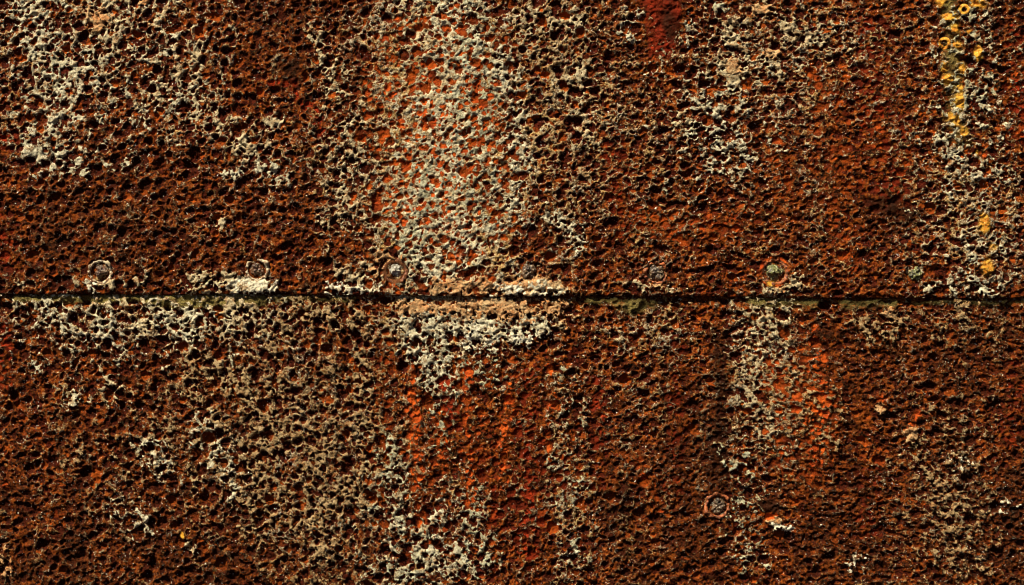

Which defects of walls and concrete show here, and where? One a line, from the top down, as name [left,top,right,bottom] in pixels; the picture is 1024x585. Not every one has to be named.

rust [81,2,115,32]
rust [640,0,682,68]
rust [858,19,917,221]
rust [350,3,579,330]
rust [760,257,790,287]
rust [880,306,898,319]
rust [405,361,480,544]
rust [493,350,557,560]
rust [763,322,839,478]
rust [874,394,887,414]
rust [902,410,922,444]
rust [758,498,796,532]